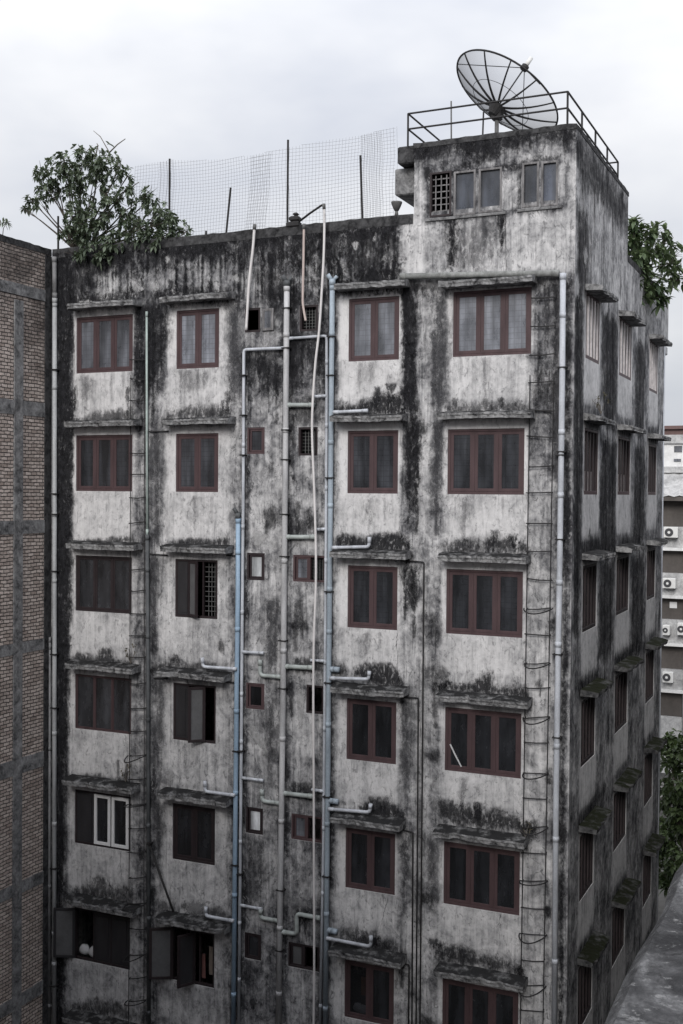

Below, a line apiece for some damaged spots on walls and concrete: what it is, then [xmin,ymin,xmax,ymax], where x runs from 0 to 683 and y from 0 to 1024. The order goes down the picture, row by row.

leakage [52,215,542,908]
leakage [414,129,646,760]
leakage [545,768,566,1024]